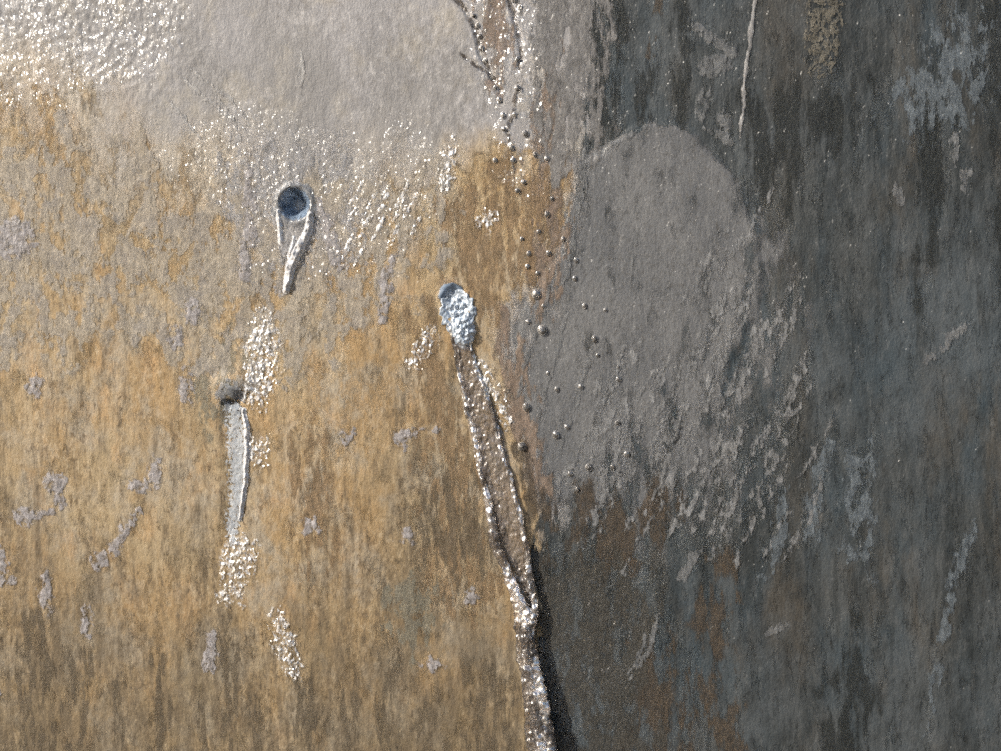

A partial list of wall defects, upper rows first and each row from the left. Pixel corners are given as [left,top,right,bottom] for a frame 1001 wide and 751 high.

crack [454,0,523,173]
damp [0,67,464,413]
rust [0,70,573,751]
damp [287,412,342,581]
rust [568,478,683,577]
damp [148,653,172,751]
damp [219,637,273,751]
damp [268,607,317,751]
damp [340,689,360,751]
damp [375,628,402,751]